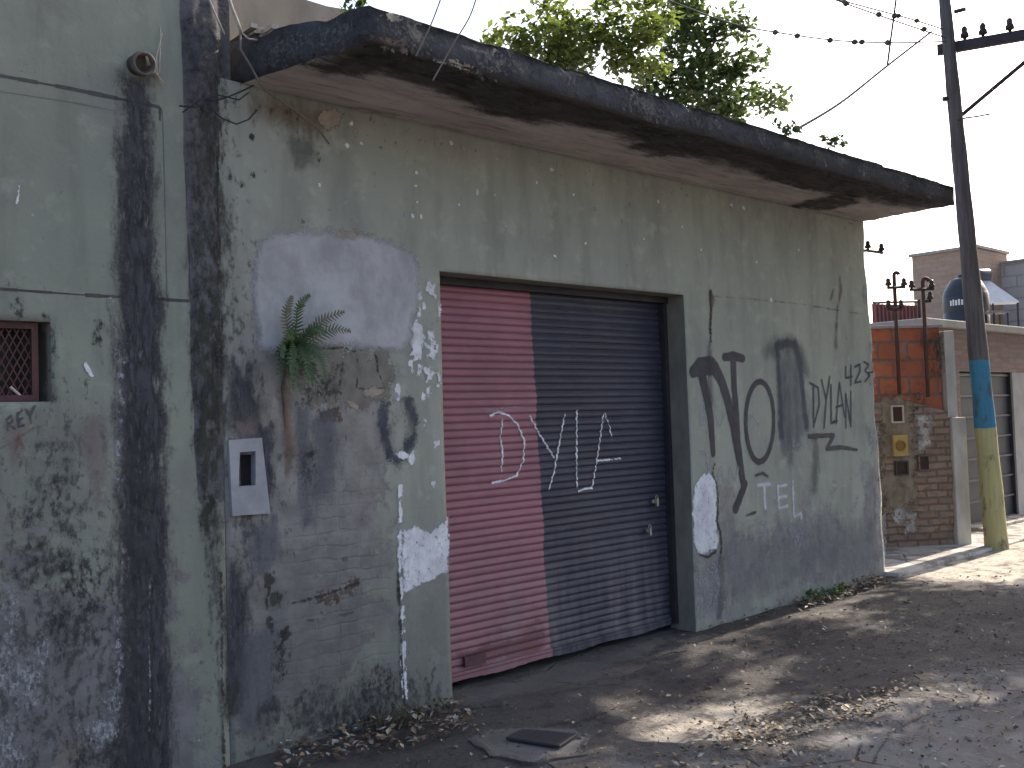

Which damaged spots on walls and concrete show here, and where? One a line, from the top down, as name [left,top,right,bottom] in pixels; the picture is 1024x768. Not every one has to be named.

damp [298,50,933,211]
damp [11,78,173,768]
damp [184,11,276,548]
peeling [396,450,416,465]
peeling [408,281,442,401]
peeling [396,484,409,705]